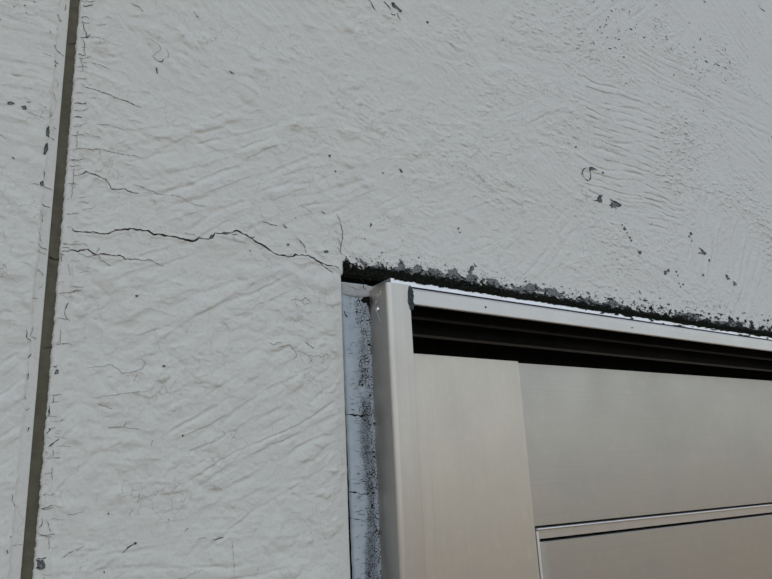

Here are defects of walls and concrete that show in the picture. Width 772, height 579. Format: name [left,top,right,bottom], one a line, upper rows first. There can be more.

crack [7,1,382,579]
water stain [342,251,772,339]